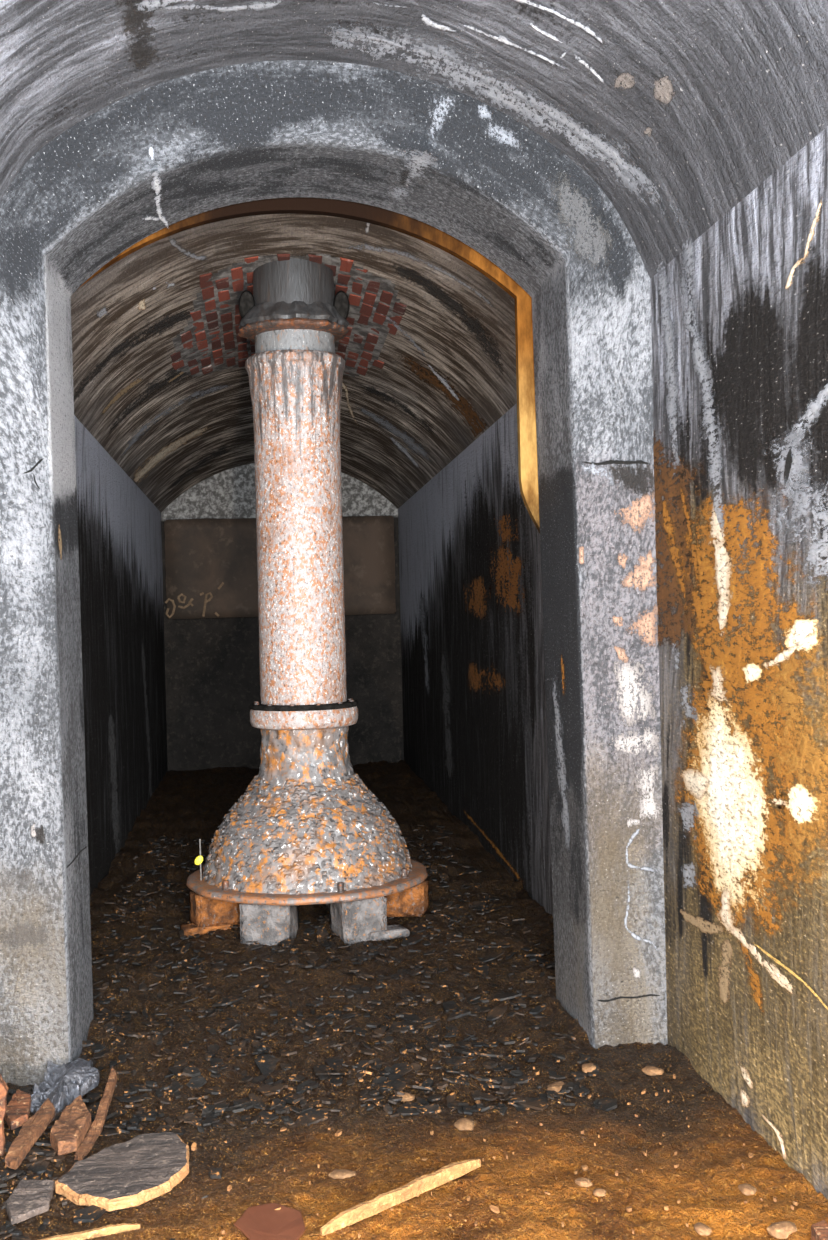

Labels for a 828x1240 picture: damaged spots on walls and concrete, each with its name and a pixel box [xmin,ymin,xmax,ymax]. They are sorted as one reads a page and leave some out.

leakage [117,0,285,69]
crack [142,147,206,261]
flaking render [170,254,407,378]
leakage [759,384,828,590]
efflorescence [742,618,819,684]
corrosion [653,431,828,1012]
efflorescence [678,665,828,1010]